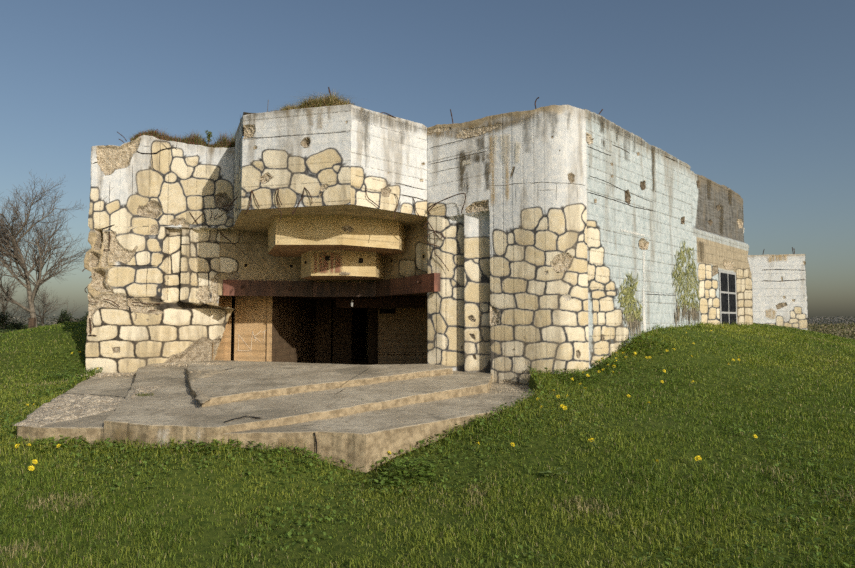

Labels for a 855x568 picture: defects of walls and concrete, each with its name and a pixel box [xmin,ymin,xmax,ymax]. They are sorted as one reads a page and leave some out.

spalling [96,138,141,175]
leakage [430,114,535,191]
spalling [137,200,162,235]
spalling [465,200,489,213]
spalling [544,252,574,274]
spalling [87,229,164,336]